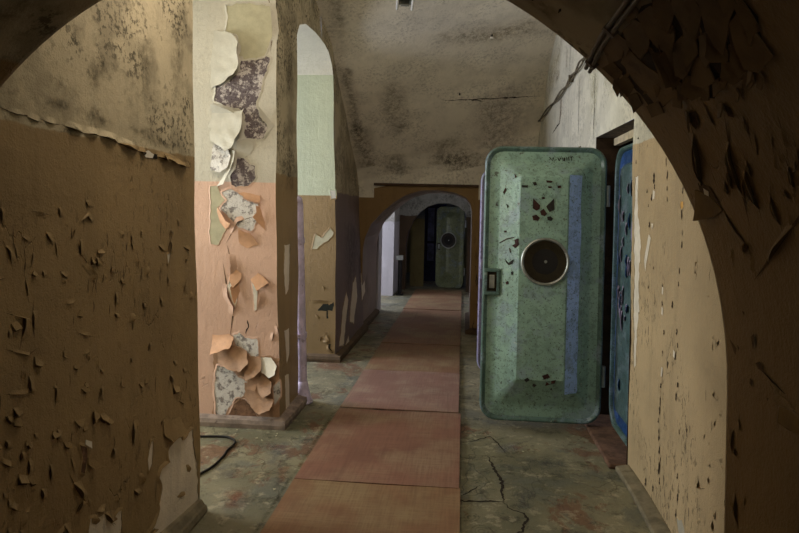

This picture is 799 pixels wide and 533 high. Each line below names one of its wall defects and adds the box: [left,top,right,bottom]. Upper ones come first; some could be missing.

peeling [0,105,189,168]
peeling [602,0,799,280]
spalling [208,1,290,417]
flaking render [311,227,335,250]
peeling [52,411,123,533]
flaking render [132,417,200,533]
crack [461,436,529,533]